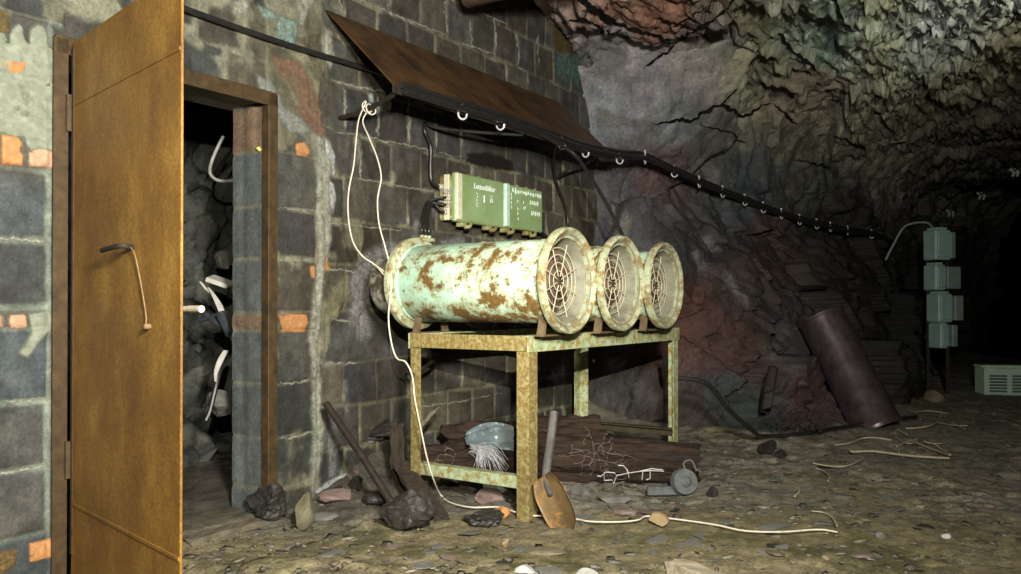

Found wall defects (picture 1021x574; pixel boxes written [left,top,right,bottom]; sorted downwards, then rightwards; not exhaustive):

flaking render [0,10,53,168]
crack [654,88,798,145]
spalling [0,315,27,328]